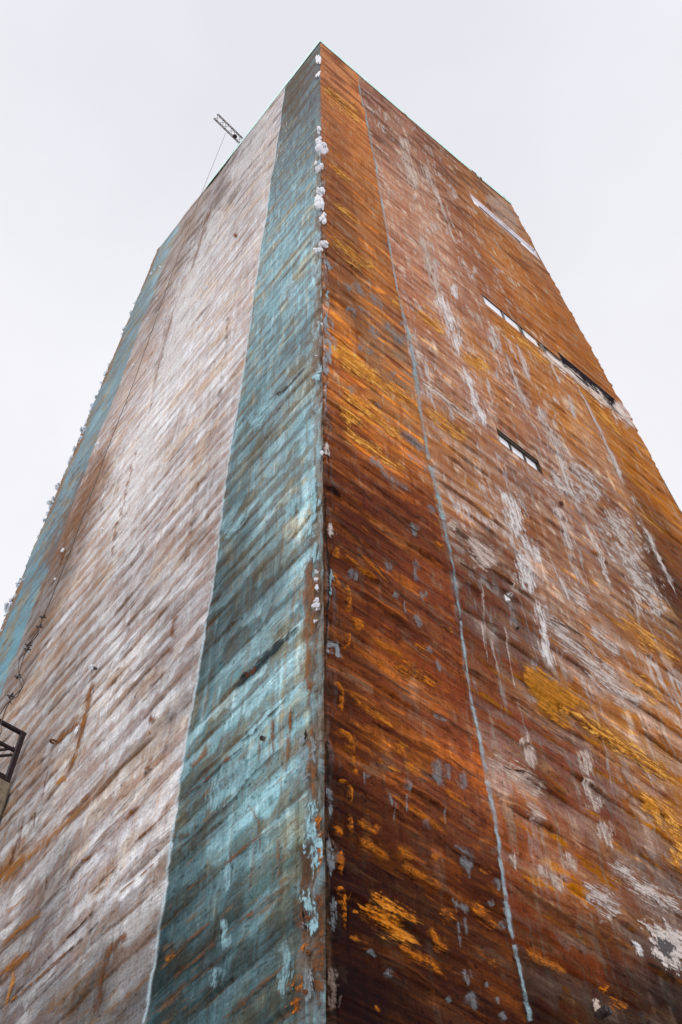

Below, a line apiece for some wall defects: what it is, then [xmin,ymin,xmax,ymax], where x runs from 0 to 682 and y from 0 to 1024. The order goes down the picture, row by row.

damp [423,368,488,427]
damp [500,345,675,619]
damp [468,537,497,569]
damp [534,605,645,706]
corrosion [55,682,93,784]
corrosion [523,665,682,867]
corrosion [0,798,93,893]
peeling [302,788,338,876]
peeling [299,888,318,936]
peeling [304,950,315,1001]
peeling [328,968,342,1009]
corrosion [353,892,447,974]